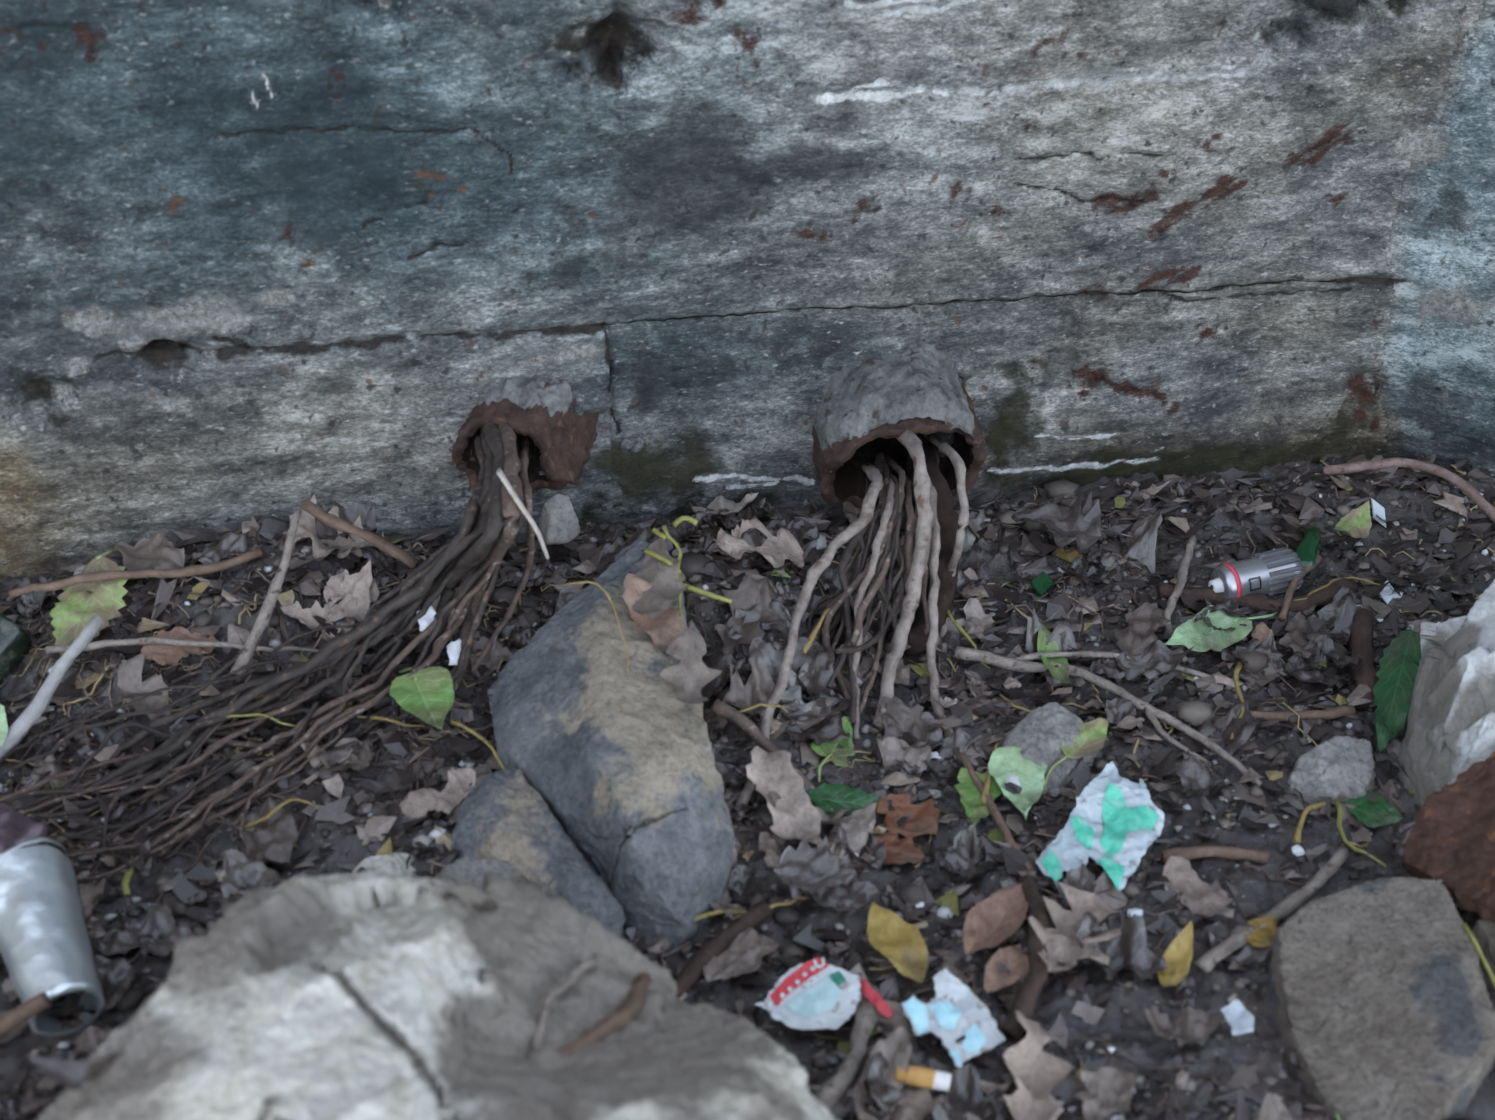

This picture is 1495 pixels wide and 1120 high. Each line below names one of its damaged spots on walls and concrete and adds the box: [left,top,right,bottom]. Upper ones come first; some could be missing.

spalling [545,8,680,89]
spalling [1249,0,1363,63]
spalling [1387,0,1412,23]
corrosion [1290,123,1356,165]
crack [1014,151,1162,207]
corrosion [1090,169,1247,241]
crack [94,276,1407,434]
corrosion [1068,365,1179,417]